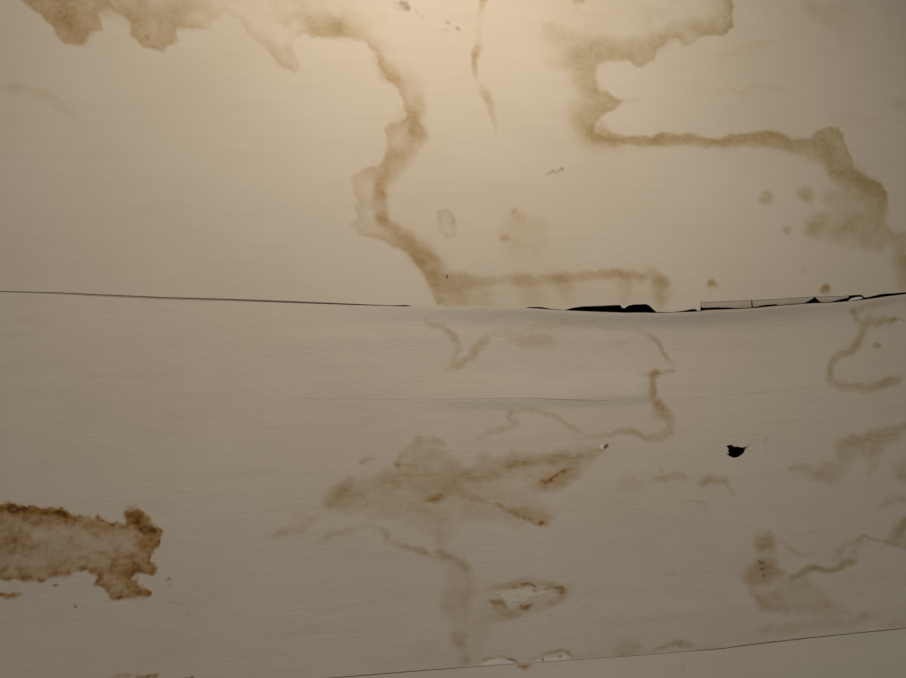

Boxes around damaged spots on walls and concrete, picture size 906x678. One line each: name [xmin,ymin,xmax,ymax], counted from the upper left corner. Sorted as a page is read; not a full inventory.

crack [0,291,406,306]
crack [527,292,906,313]